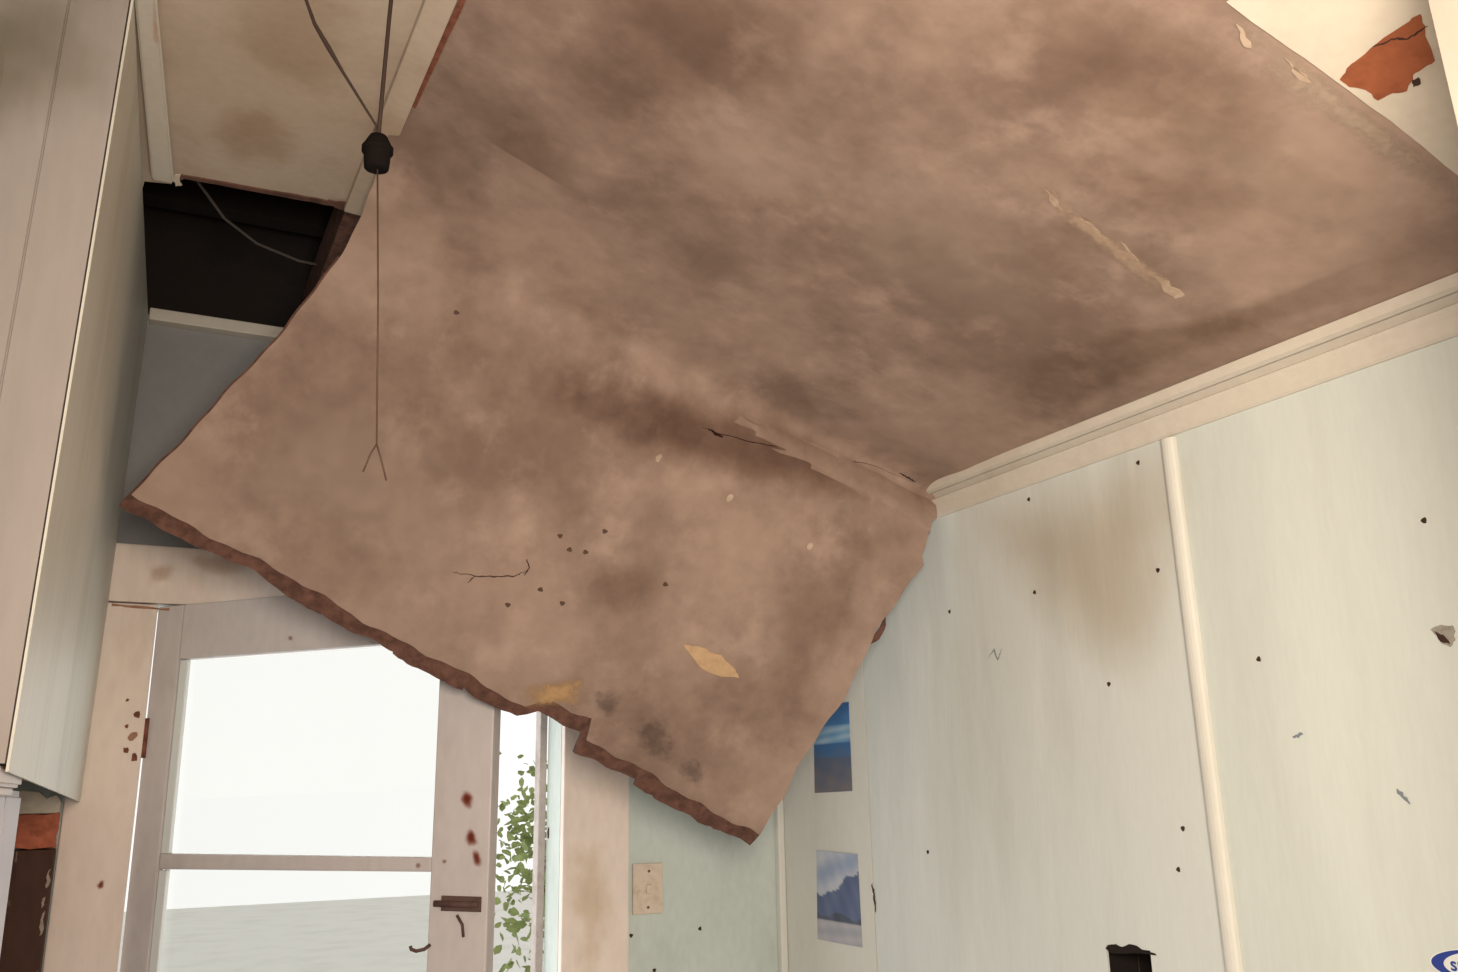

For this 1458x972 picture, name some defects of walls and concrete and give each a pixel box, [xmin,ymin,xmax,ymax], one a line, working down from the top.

peeling [1227,0,1458,183]
peeling [1154,276,1185,299]
spalling [1106,944,1159,972]